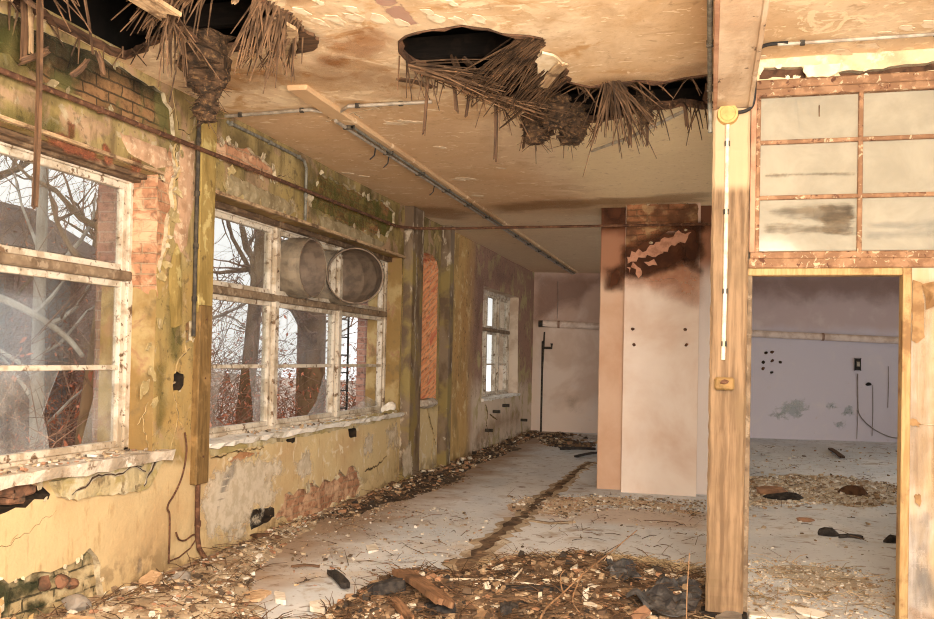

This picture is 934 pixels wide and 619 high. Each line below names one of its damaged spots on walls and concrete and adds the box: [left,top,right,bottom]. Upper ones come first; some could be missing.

leakage [0,13,157,97]
flaking render [758,55,805,79]
peeling [830,20,934,56]
flaking render [840,63,934,76]
flaking render [0,45,184,298]
flaking render [626,203,698,278]
crack [72,344,192,495]
spalling [0,481,48,507]
flaking render [250,466,360,524]
crack [0,511,56,547]
flaking render [0,551,107,619]